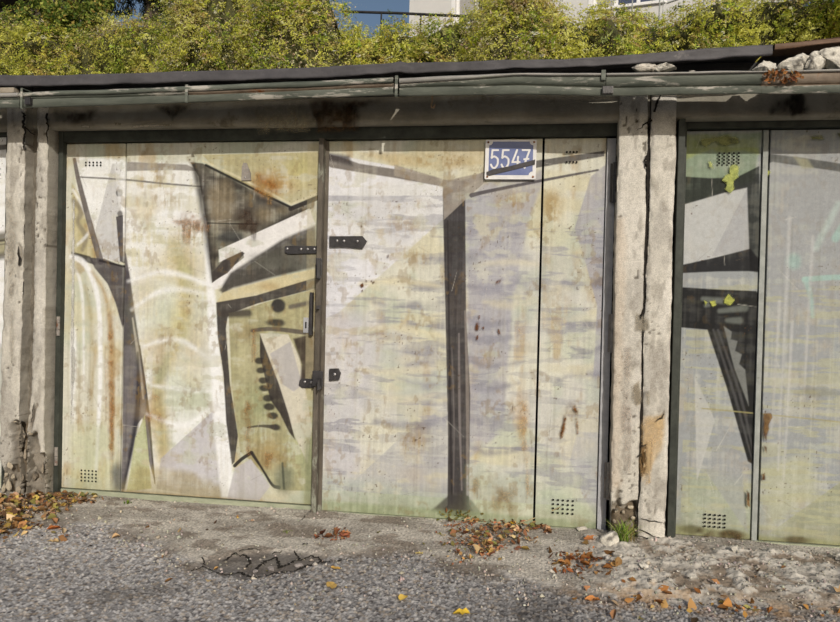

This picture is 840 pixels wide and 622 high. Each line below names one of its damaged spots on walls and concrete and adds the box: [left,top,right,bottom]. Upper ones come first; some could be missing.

spalling [1,421,44,493]
crack [636,95,664,539]